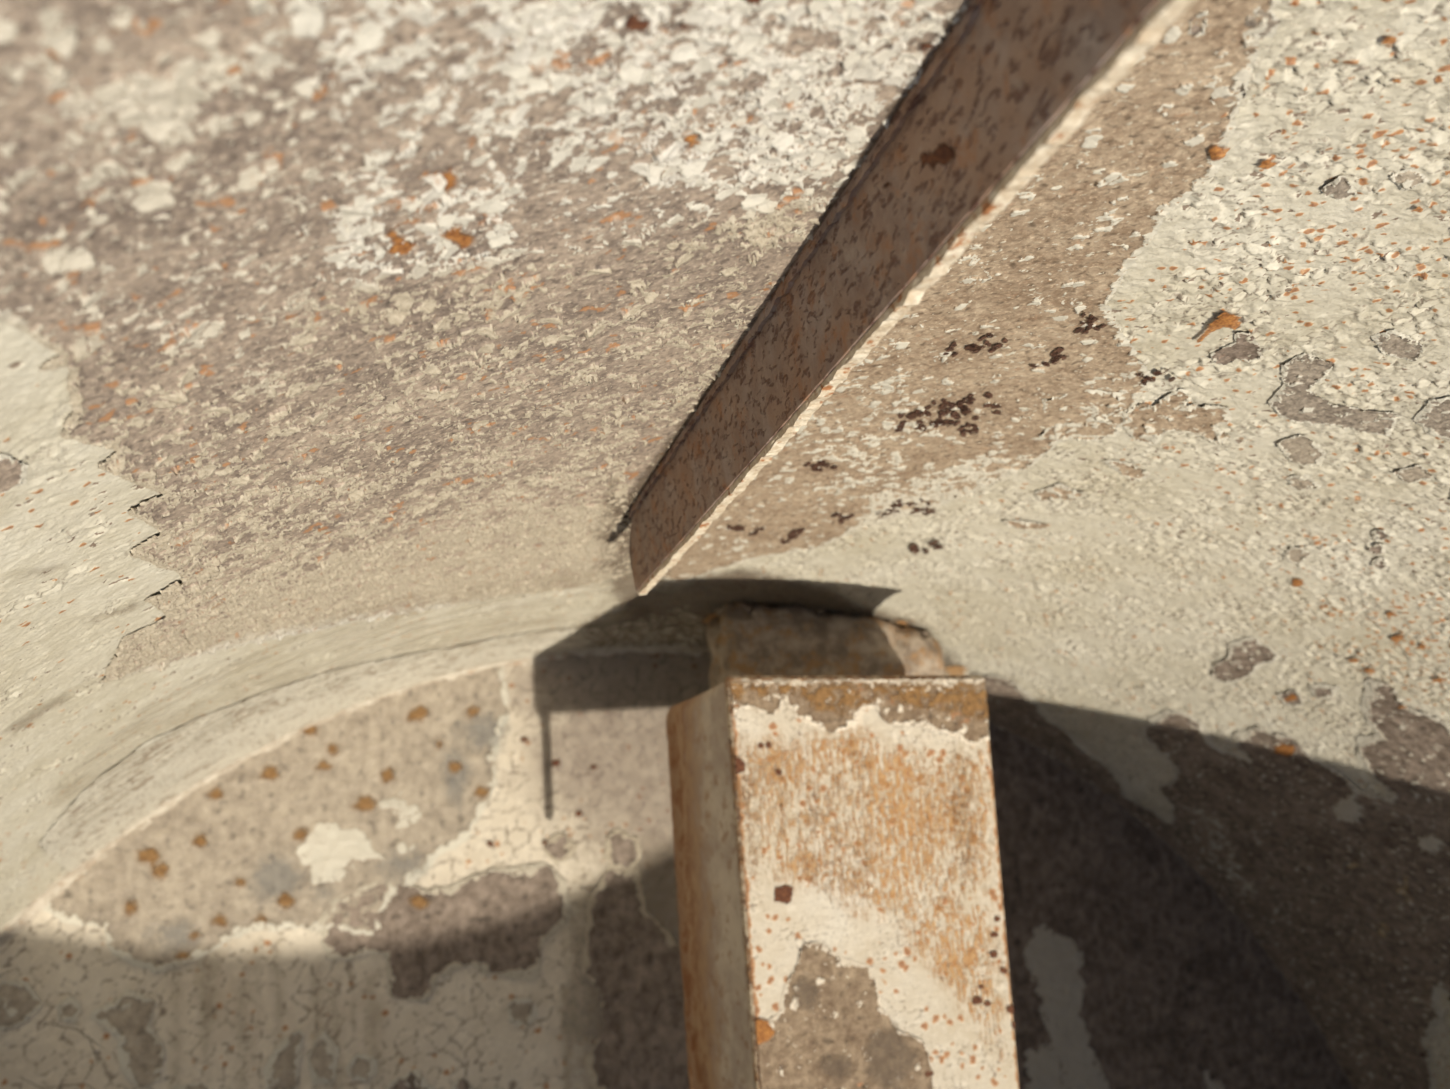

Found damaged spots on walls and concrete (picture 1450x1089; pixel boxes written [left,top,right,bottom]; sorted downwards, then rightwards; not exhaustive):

corrosion [625,16,653,31]
corrosion [445,228,474,249]
peeling [0,0,969,683]
corrosion [1197,312,1241,343]
peeling [1371,329,1424,362]
peeling [1268,353,1450,491]
corrosion [590,496,917,648]
corrosion [731,658,988,719]
peeling [1211,637,1282,685]
peeling [37,606,706,1089]
corrosion [735,730,1015,1034]
peeling [732,673,1450,1089]